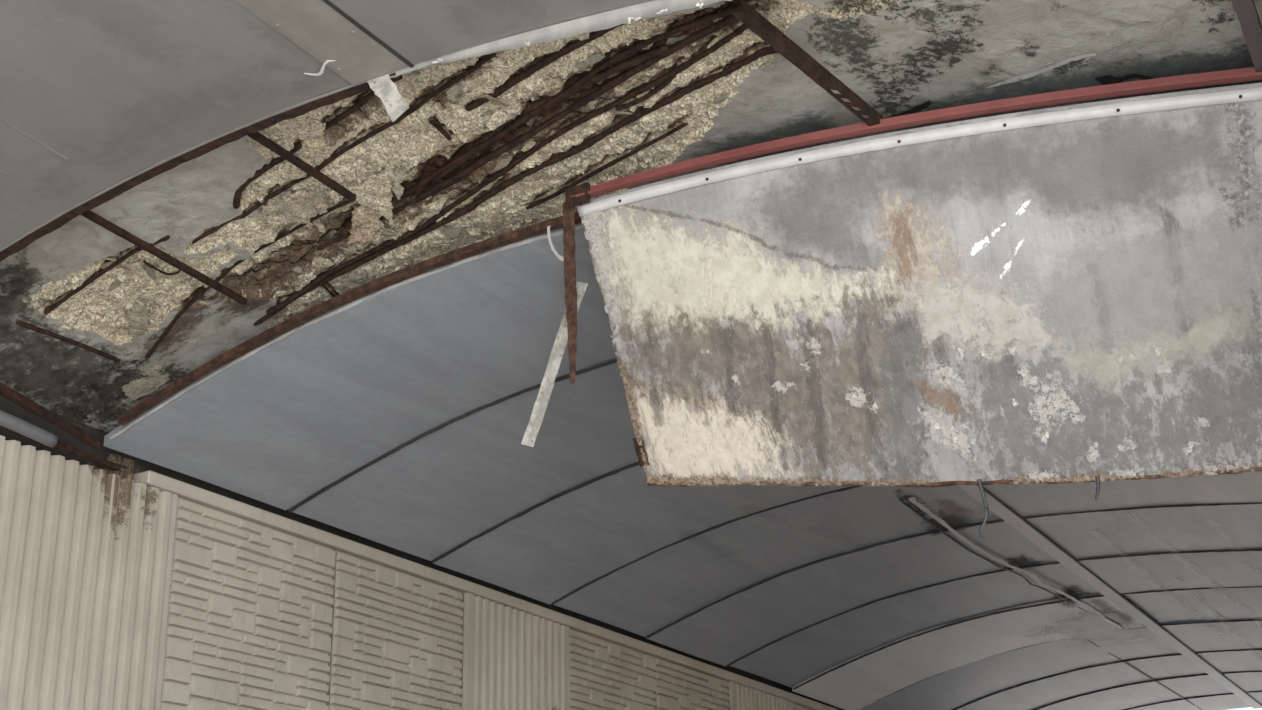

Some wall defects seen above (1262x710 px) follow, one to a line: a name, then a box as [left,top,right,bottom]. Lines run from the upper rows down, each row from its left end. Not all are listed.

rust [324,90,382,147]
spalling [16,0,904,401]
rust [380,0,788,237]
leakage [707,115,834,165]
leakage [805,0,1262,129]
leakage [885,120,1218,209]
mould [0,250,190,432]
rust [143,203,368,357]
peeling [844,385,878,414]
leakage [593,153,1247,535]